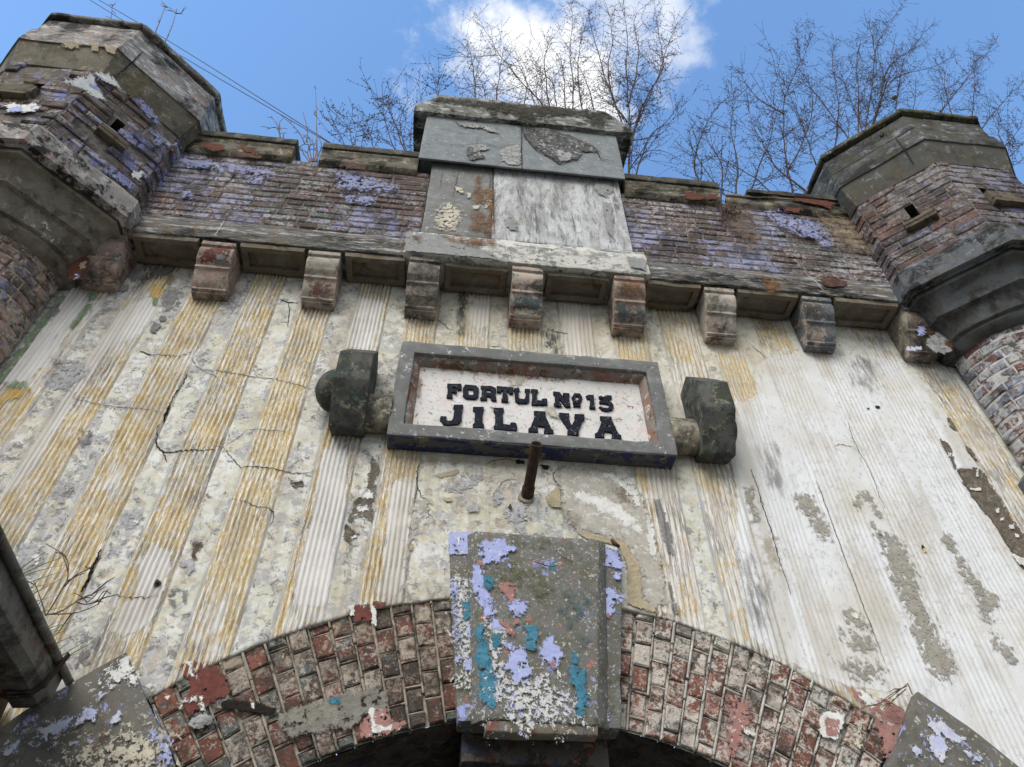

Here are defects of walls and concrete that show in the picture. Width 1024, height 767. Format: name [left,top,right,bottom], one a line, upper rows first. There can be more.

peeling [0,102,41,113]
peeling [65,71,122,101]
flaking render [461,123,601,165]
peeling [432,186,495,233]
crack [77,351,314,474]
peeling [344,456,380,545]
flaking render [940,439,1024,569]
crack [80,549,102,592]
flaking render [444,464,679,743]
peeling [2,653,277,767]
peeling [359,707,406,738]
peeling [912,714,986,767]